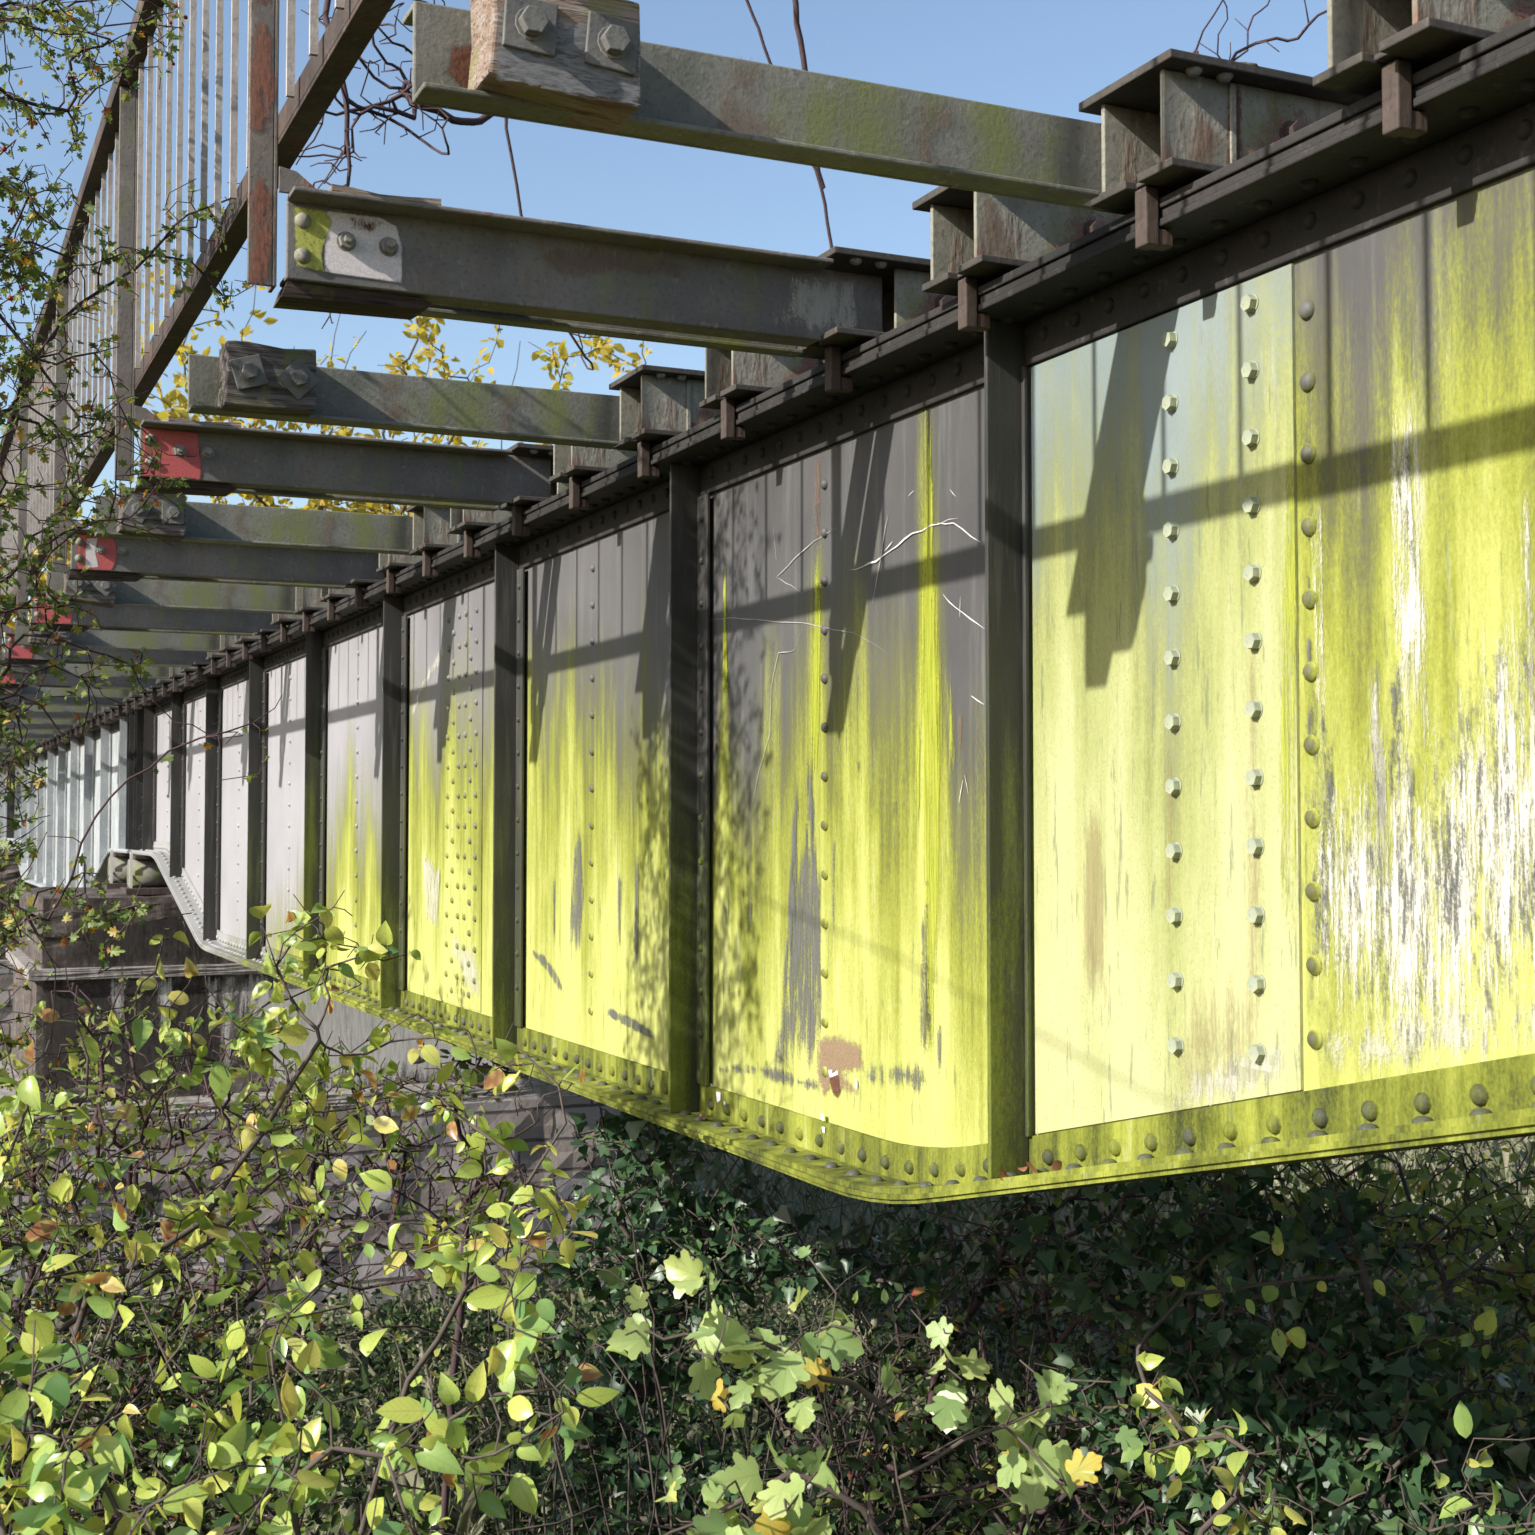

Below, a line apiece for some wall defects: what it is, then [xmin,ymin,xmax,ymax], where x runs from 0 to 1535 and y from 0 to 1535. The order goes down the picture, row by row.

damp [1397,455,1414,570]
damp [1389,656,1403,794]
damp [1307,710,1334,962]
damp [1438,756,1485,938]